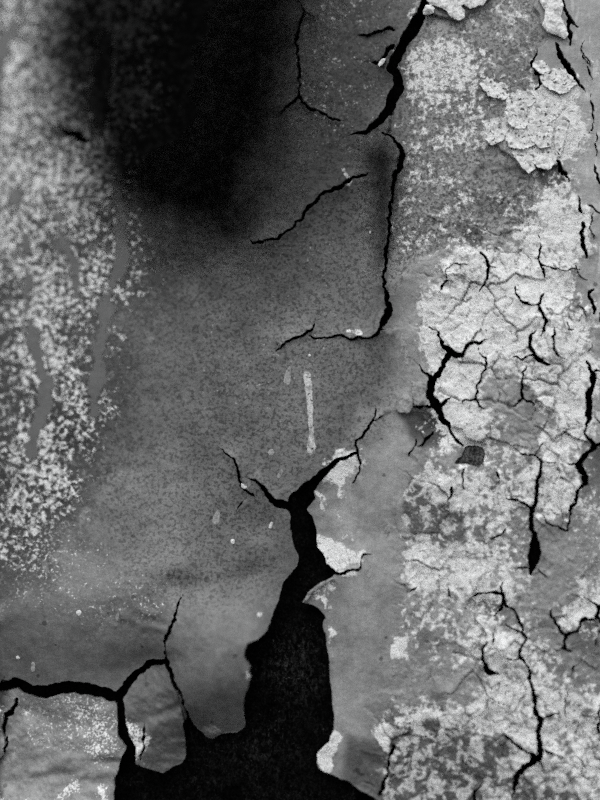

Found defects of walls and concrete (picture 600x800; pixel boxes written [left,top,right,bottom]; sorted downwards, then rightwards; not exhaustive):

leakage [0,0,25,110]
leakage [21,233,55,461]
leakage [52,206,83,299]
crack [276,0,428,351]
crack [408,327,488,456]
peeling [386,0,577,293]
crack [496,347,600,577]
crack [512,198,600,407]
crack [0,597,190,775]
peeling [0,494,358,800]
peeling [503,730,537,754]
crack [448,582,600,796]